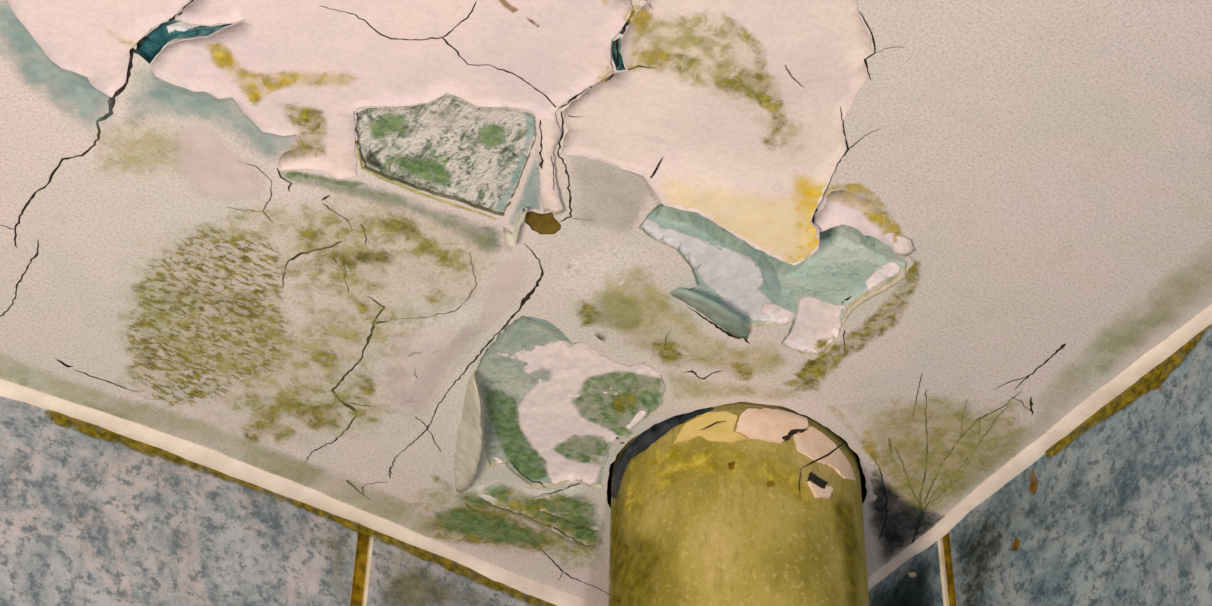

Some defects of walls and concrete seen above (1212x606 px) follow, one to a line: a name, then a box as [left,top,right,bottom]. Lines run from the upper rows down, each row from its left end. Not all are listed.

crack [0,0,194,317]
peeling [7,0,915,357]
crack [321,0,653,222]
water stain [129,229,394,441]
water stain [45,410,557,606]
crack [282,195,477,462]
crack [346,244,544,500]
flaking render [454,316,666,509]
water stain [431,446,810,606]
water stain [866,414,1018,557]
crack [874,344,1066,544]
water stain [1045,323,1212,458]